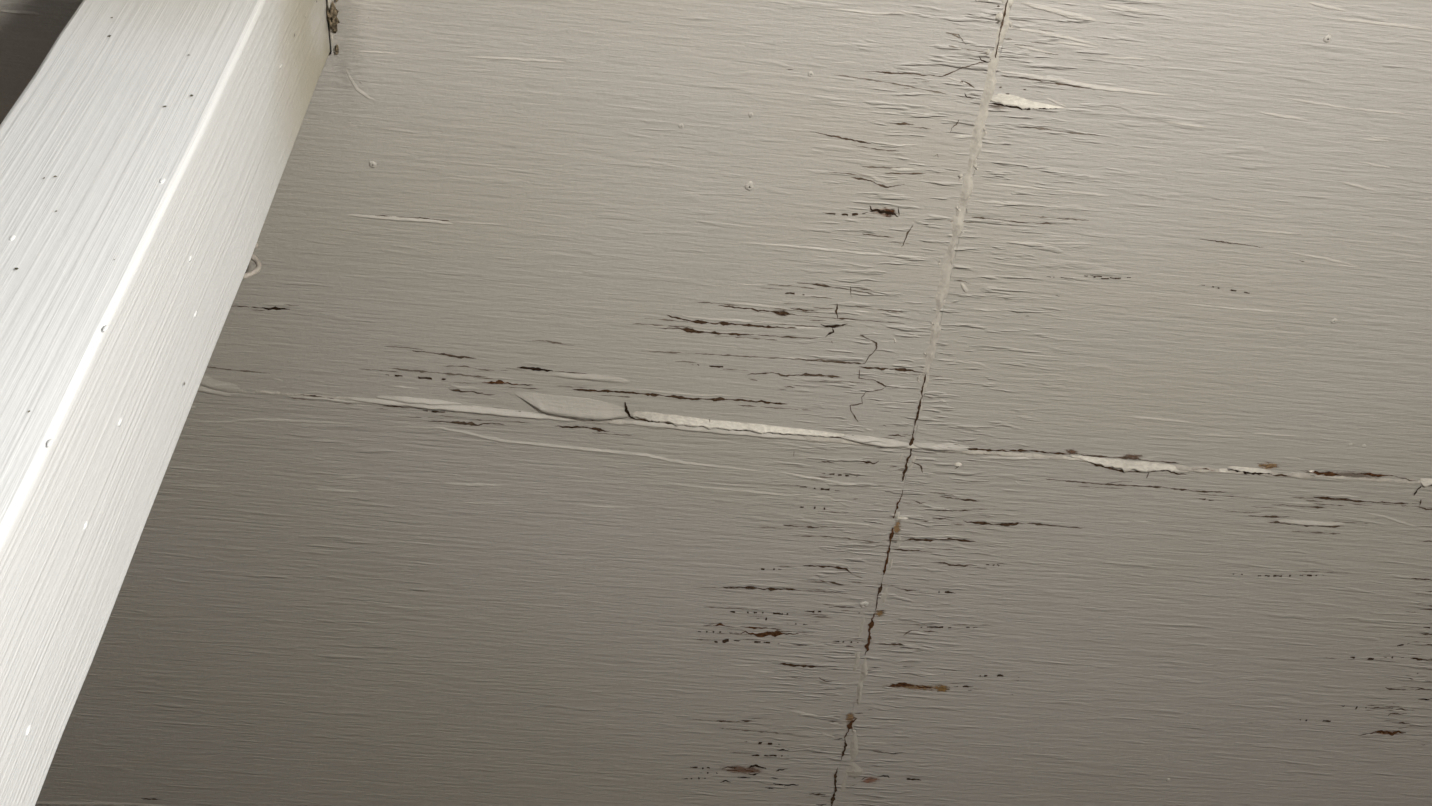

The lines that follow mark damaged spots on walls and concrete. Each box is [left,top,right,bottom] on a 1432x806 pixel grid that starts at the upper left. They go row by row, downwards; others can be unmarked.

peeling [990,93,1064,110]
crack [237,303,299,311]
peeling [345,396,581,422]
peeling [624,411,845,441]
peeling [1071,455,1287,478]
peeling [1308,470,1432,495]
crack [288,283,1432,806]
peeling [685,764,798,789]